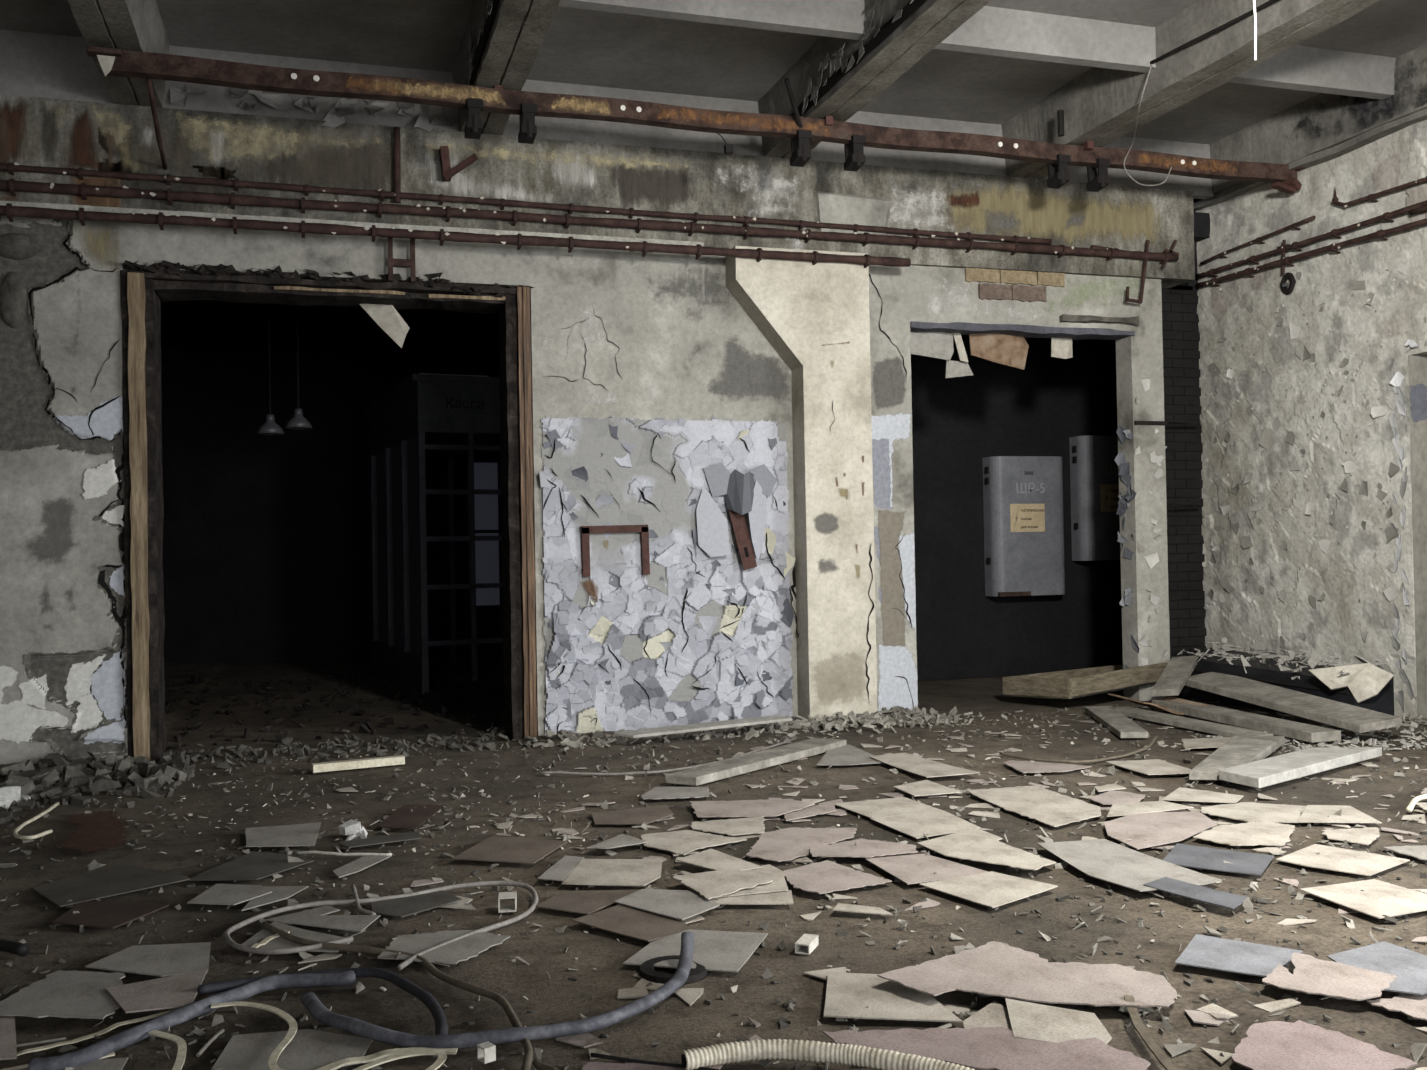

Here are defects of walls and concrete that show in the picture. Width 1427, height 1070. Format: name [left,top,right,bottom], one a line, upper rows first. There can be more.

rust [0,103,25,164]
leakage [1339,62,1427,131]
flaking render [965,268,1065,302]
peeling [1335,247,1408,312]
crack [545,308,622,391]
spalling [0,219,128,759]
peeling [1208,260,1427,710]
peeling [539,414,796,735]